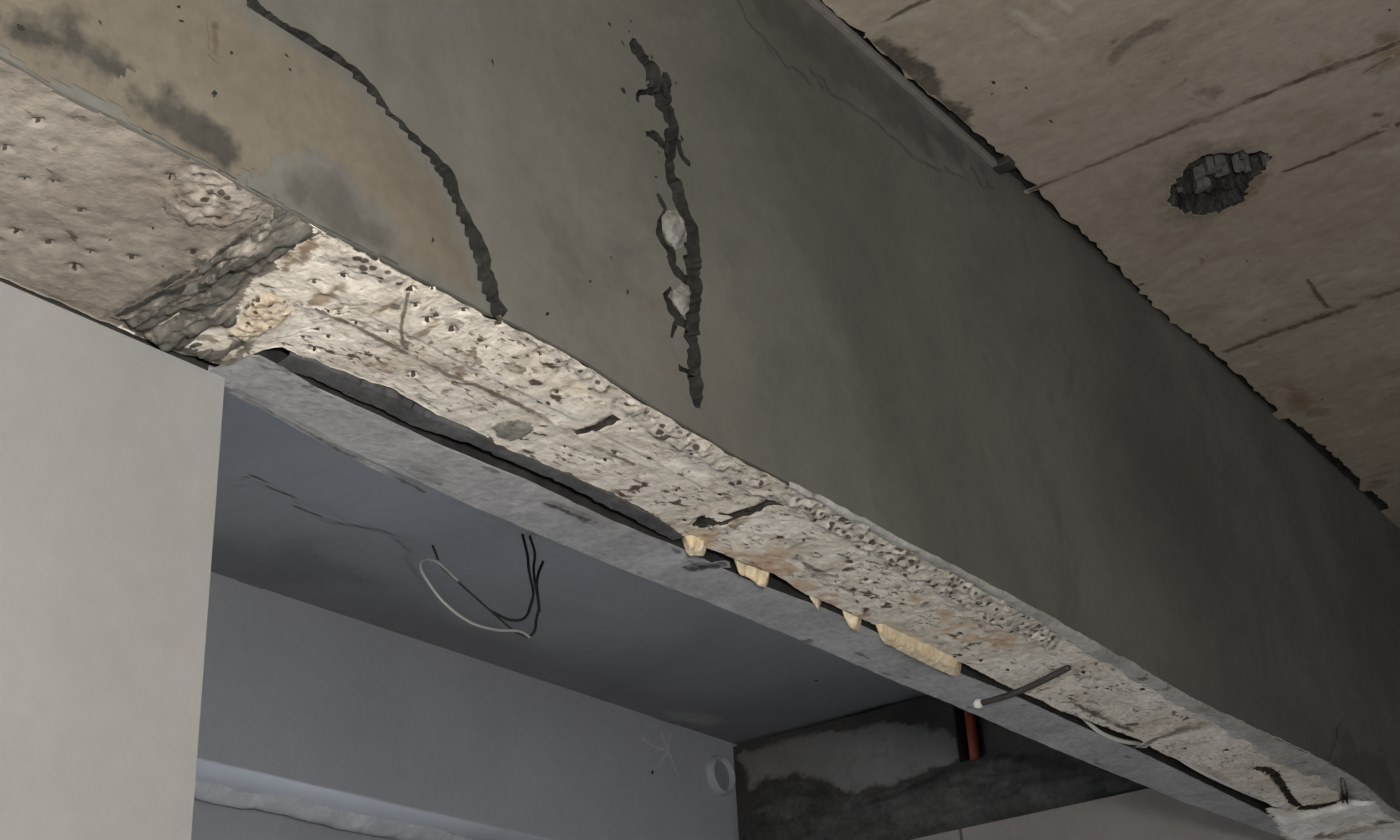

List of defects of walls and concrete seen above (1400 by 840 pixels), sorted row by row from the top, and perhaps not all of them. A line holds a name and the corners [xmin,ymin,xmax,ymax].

spalling [105,159,454,366]
crack [246,0,508,321]
crack [608,19,704,408]
spalling [1167,149,1273,215]
spalling [494,320,1066,654]
spalling [1266,799,1400,840]